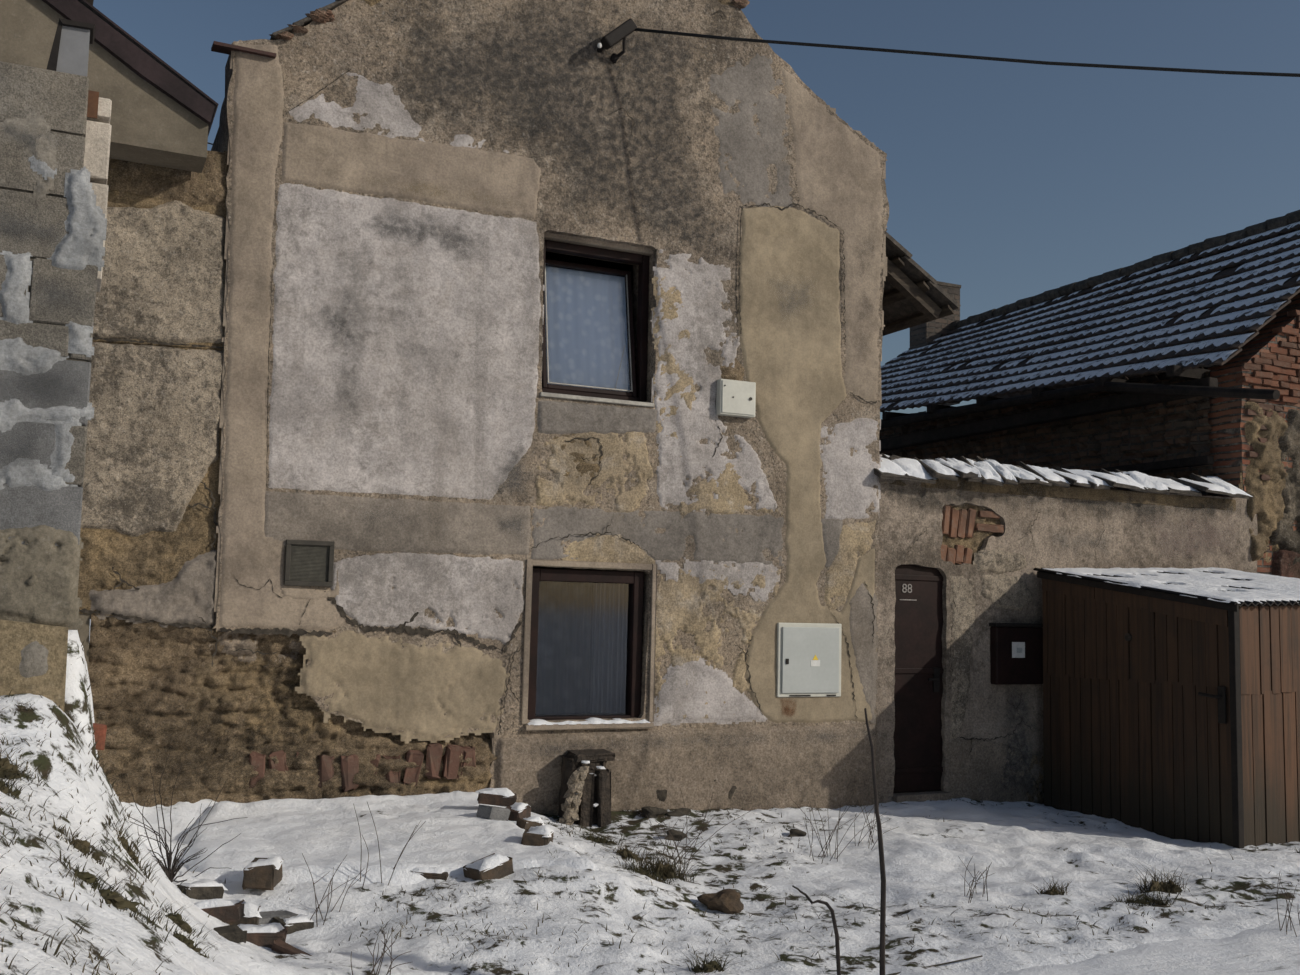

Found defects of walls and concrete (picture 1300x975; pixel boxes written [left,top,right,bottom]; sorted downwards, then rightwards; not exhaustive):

peeling [289,72,425,142]
peeling [450,134,486,148]
peeling [535,249,783,516]
peeling [1239,401,1300,579]
peeling [78,532,217,628]
peeling [648,557,781,726]
peeling [941,503,1033,739]